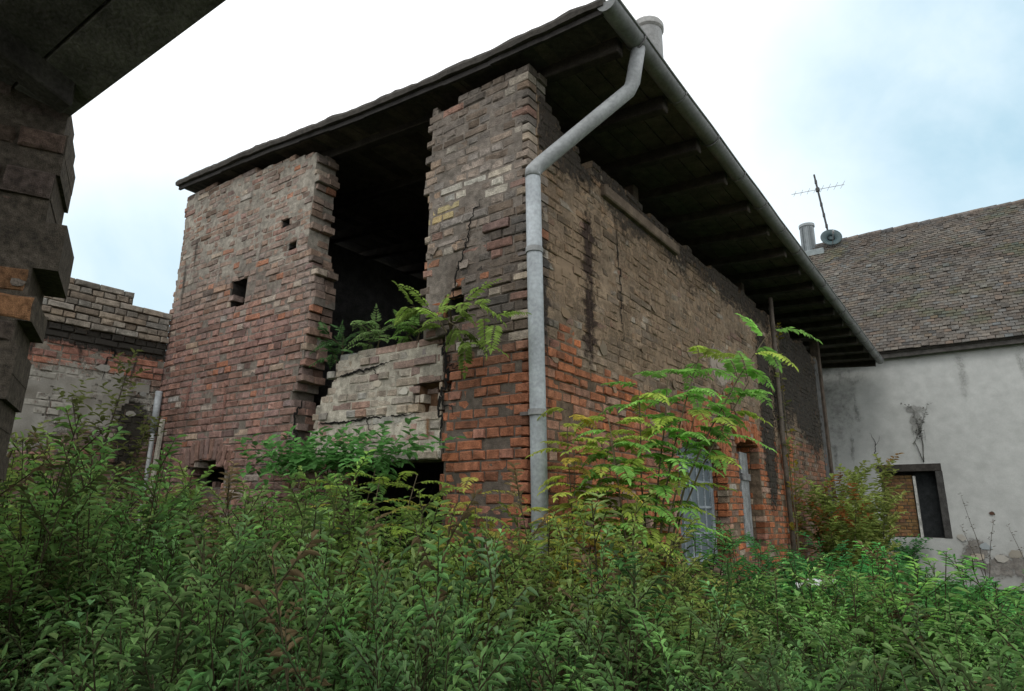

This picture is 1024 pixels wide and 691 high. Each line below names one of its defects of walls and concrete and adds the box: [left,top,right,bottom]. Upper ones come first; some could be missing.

crack [281,198,483,469]
damp [756,325,831,511]
peeling [957,534,1024,582]